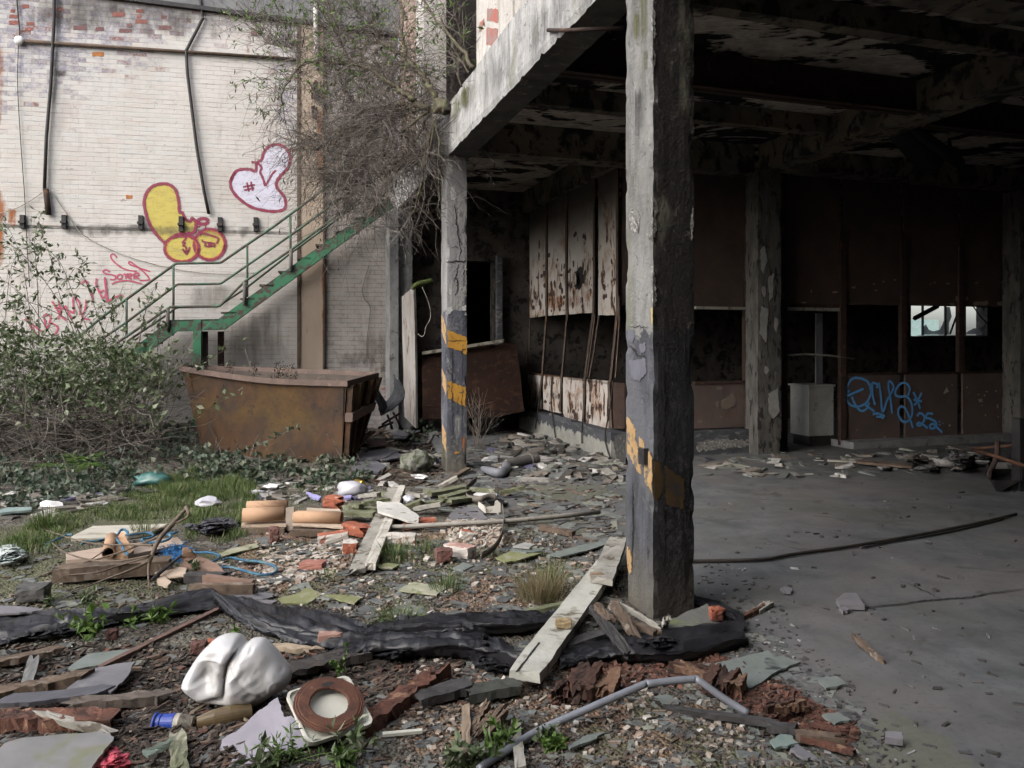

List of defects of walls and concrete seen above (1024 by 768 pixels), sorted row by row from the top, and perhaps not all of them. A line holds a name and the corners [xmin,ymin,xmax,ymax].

flaking render [9,4,35,31]
flaking render [112,9,172,33]
crack [446,205,466,418]
peeling [759,246,779,342]
peeling [628,330,647,382]
peeling [768,388,780,418]